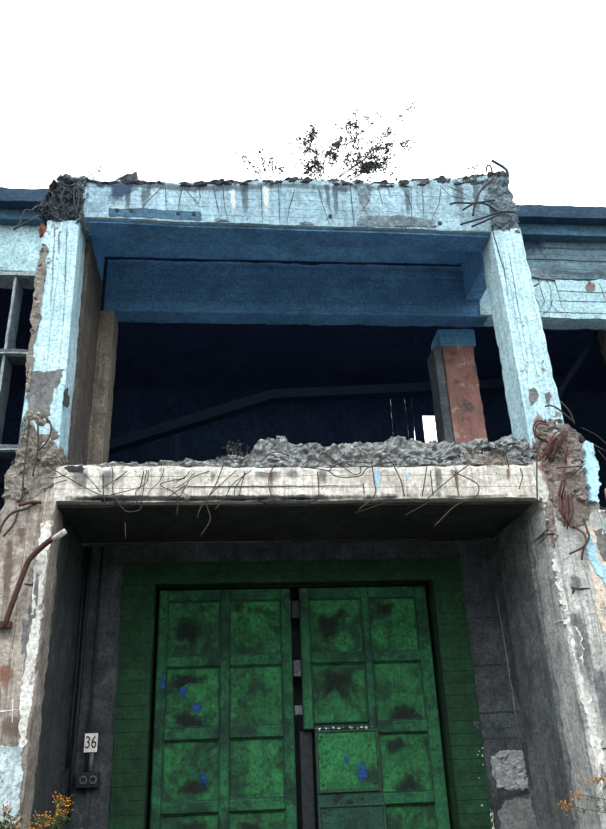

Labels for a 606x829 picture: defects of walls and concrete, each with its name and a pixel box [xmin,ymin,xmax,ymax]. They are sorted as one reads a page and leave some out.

spalling [13,175,85,230]
damp [97,181,132,199]
damp [262,186,270,210]
spalling [450,159,515,229]
crack [527,241,606,316]
spalling [0,244,209,537]
spalling [197,447,252,536]
spalling [301,456,405,513]
spalling [405,448,510,526]
spalling [529,387,606,809]
flaking render [0,520,53,829]
spalling [477,748,539,829]